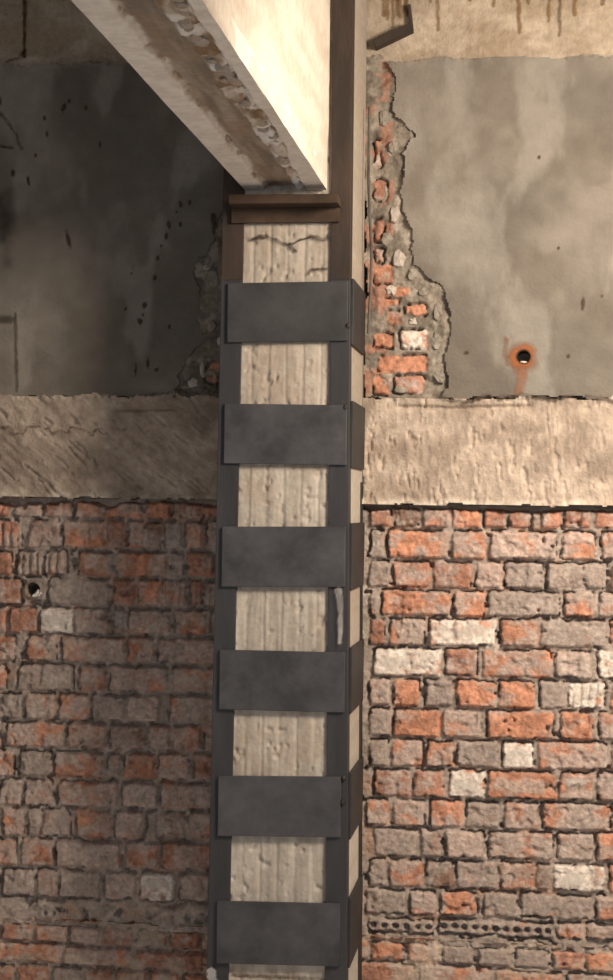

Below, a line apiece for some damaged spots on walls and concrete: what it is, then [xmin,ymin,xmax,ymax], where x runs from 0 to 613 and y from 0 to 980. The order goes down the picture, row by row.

crack [7,0,27,62]
spalling [115,0,304,190]
flaking render [175,212,223,398]
crack [251,235,327,274]
flaking render [364,54,451,399]
corrosion [505,338,534,378]